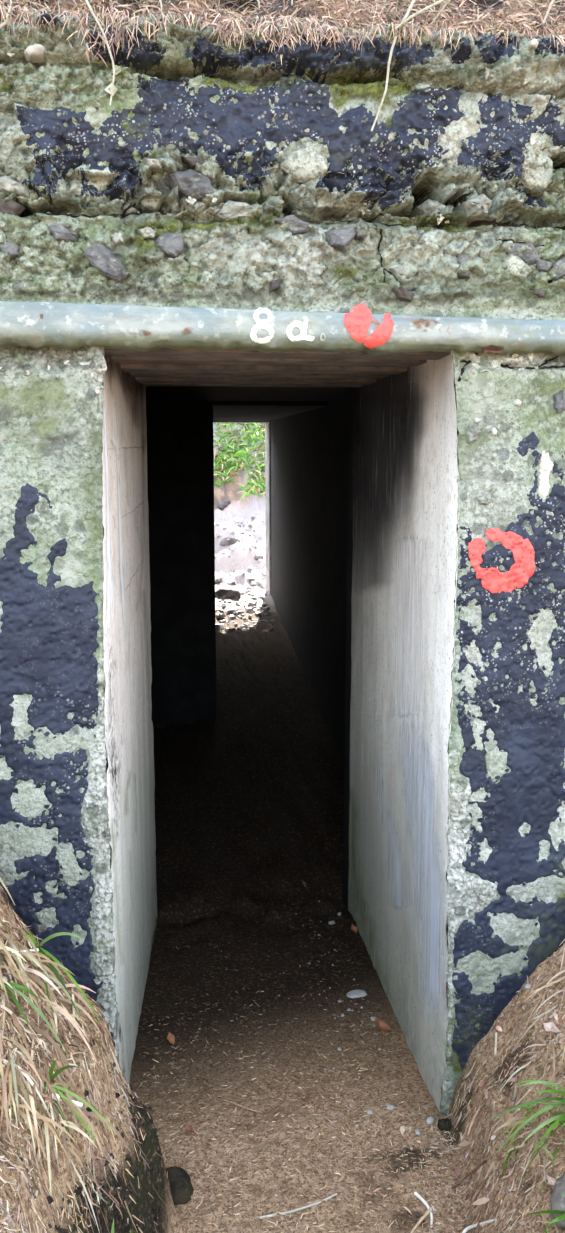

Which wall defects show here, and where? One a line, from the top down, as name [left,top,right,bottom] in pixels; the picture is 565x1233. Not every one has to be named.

crack [320,213,438,285]
crack [469,205,565,255]
peeling [538,450,554,501]
spalling [0,642,119,1060]
spalling [442,599,565,1095]